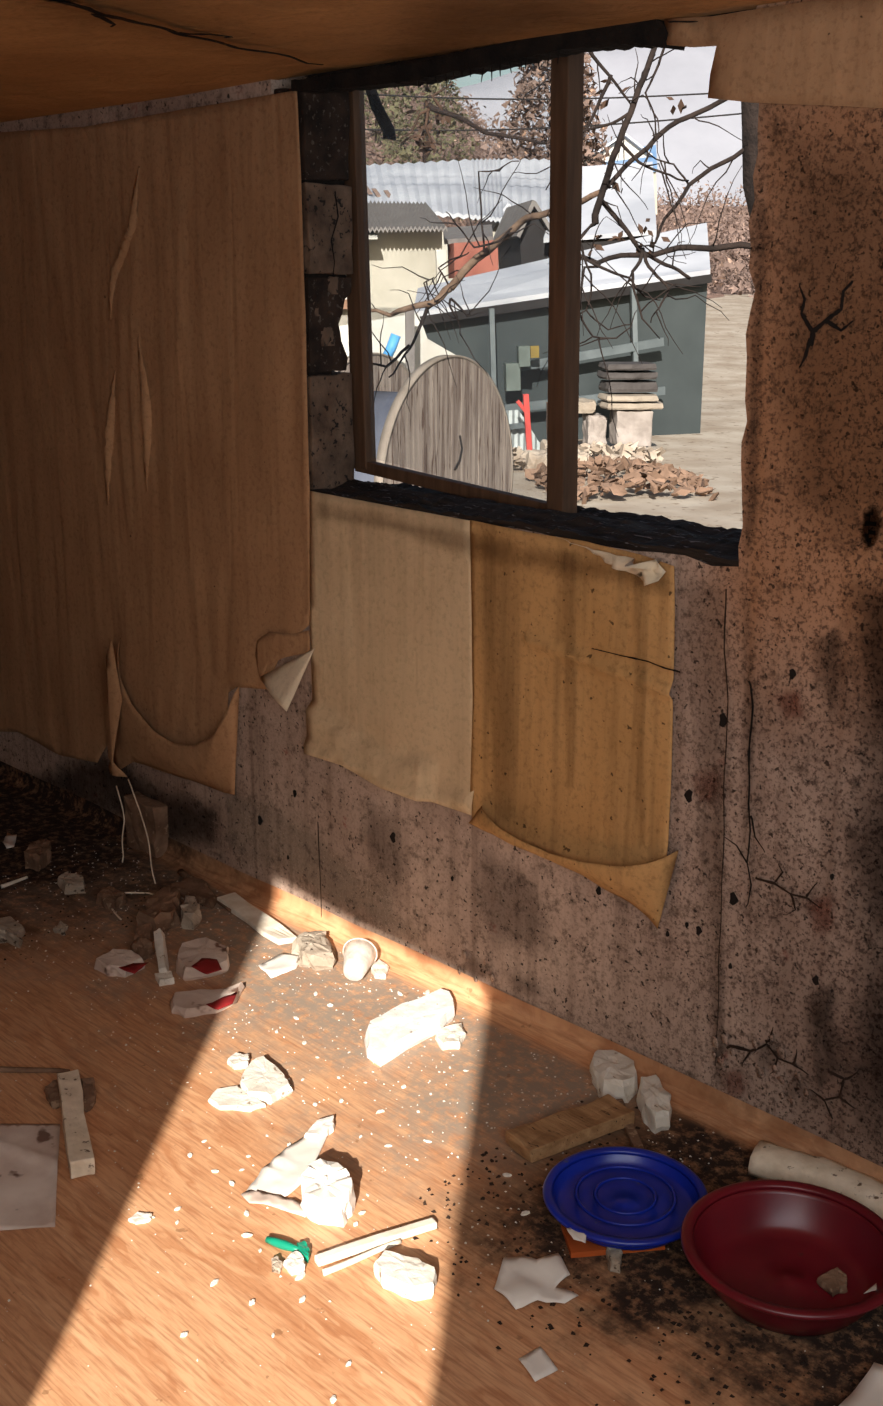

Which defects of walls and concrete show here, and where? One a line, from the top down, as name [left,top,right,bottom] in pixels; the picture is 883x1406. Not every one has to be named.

crack [58,2,400,77]
crack [799,280,854,368]
crack [715,589,859,1119]